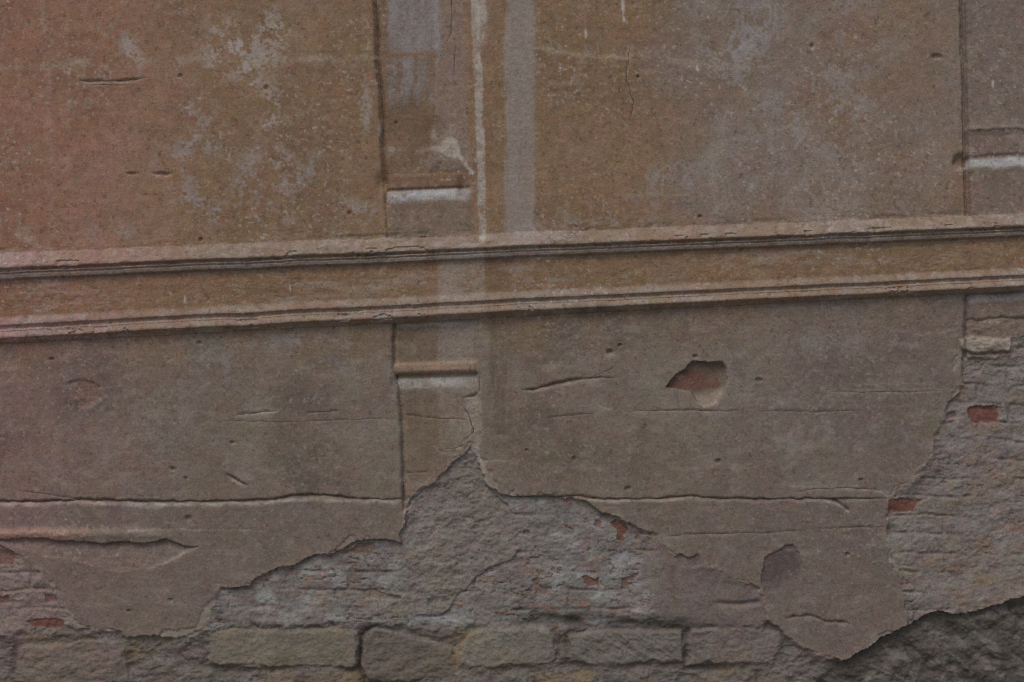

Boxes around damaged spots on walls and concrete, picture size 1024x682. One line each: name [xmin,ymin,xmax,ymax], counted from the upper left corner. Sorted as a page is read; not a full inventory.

crack [527,368,612,390]
spalling [665,360,710,406]
crack [2,474,393,503]
crack [505,487,885,529]
spalling [816,334,1024,682]
spalling [204,452,804,631]
crack [666,529,791,537]
spalling [0,536,199,635]